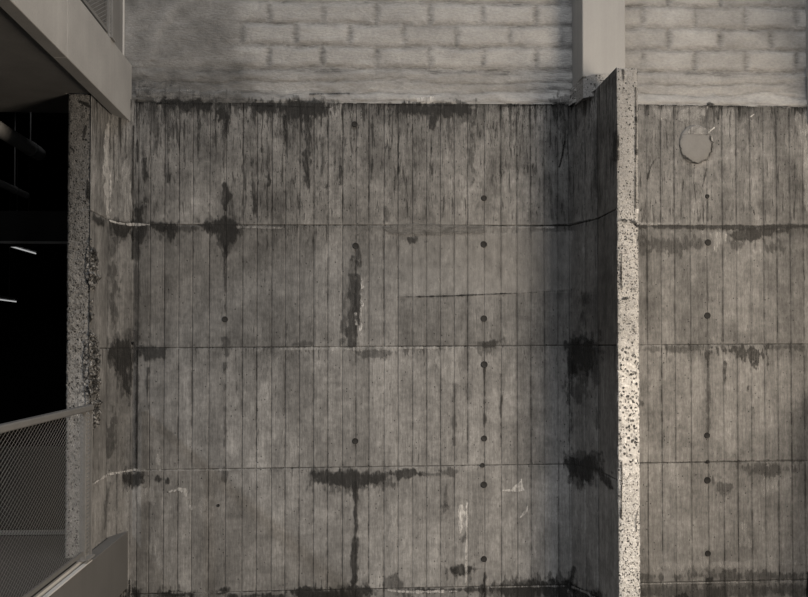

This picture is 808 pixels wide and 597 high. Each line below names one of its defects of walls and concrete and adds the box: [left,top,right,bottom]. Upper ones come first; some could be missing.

leakage [149,96,230,130]
leakage [247,96,332,189]
leakage [388,99,472,130]
leakage [93,123,243,286]
leakage [638,224,808,256]
leakage [340,247,386,357]
leakage [564,315,598,440]
leakage [94,469,143,489]
leakage [564,451,613,490]
leakage [212,468,422,597]